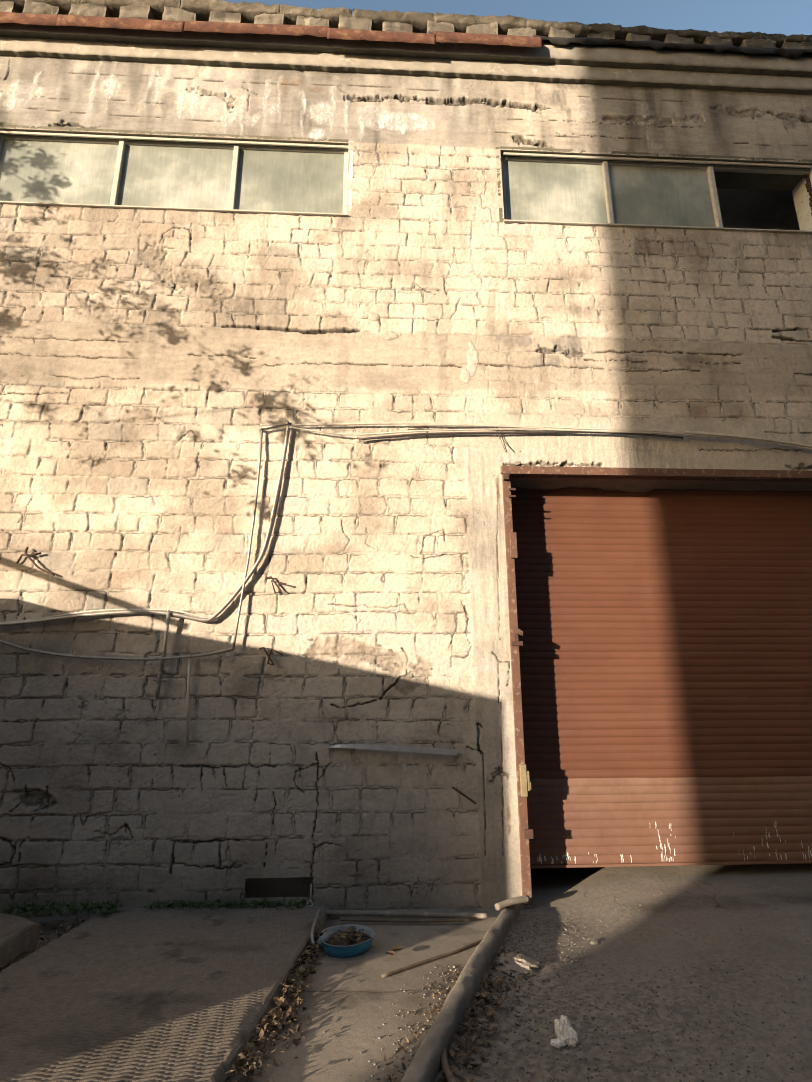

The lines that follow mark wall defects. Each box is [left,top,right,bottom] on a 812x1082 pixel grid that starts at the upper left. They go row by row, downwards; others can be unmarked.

crack [156,76,297,106]
crack [188,354,504,368]
crack [530,350,740,372]
crack [1,764,49,812]
crack [0,836,25,866]